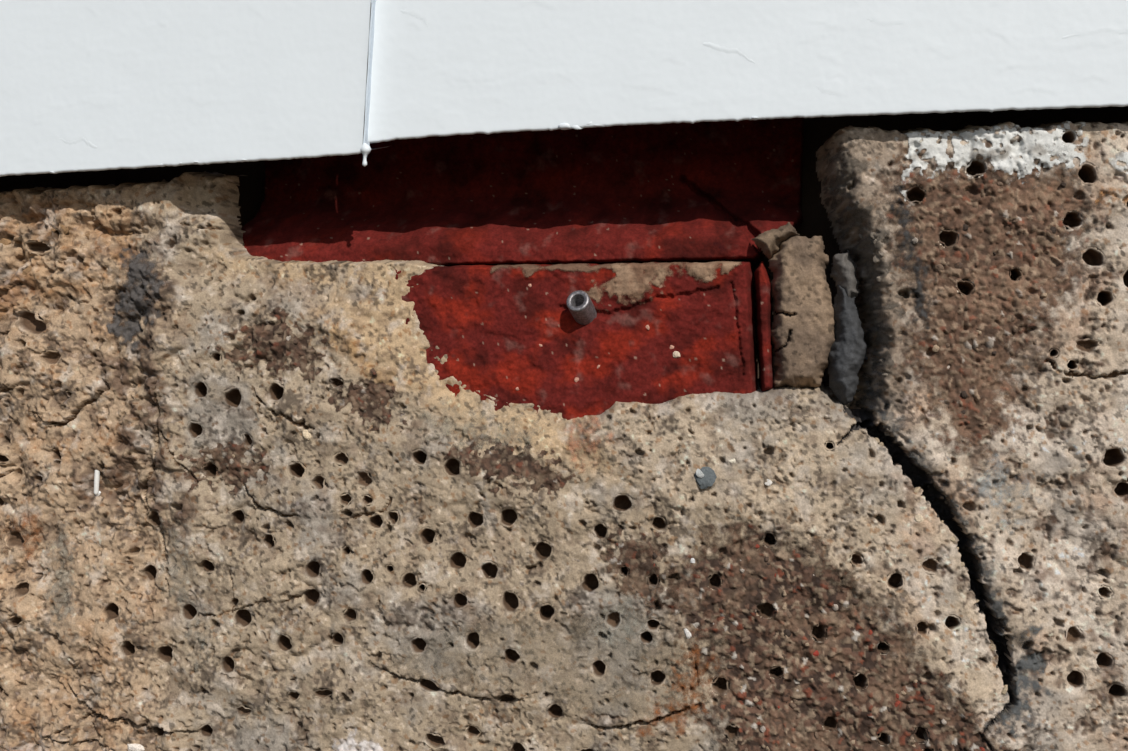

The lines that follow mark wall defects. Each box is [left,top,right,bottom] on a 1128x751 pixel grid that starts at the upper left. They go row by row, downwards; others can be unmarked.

spalling [241,110,804,420]
crack [859,232,895,308]
crack [1045,359,1128,379]
crack [832,335,1019,750]
crack [591,710,687,729]